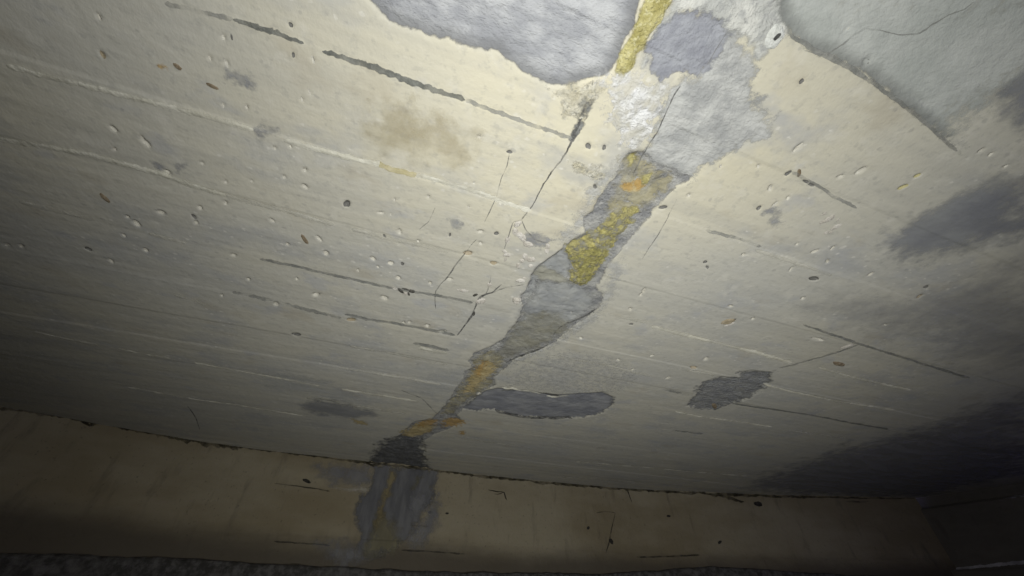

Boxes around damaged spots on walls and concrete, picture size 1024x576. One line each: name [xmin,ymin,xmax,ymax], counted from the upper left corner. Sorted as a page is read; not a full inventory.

peeling [371,0,639,85]
peeling [637,0,1024,184]
crack [504,97,594,249]
water stain [894,184,1024,258]
spalling [370,256,415,300]
crack [458,284,521,334]
spalling [688,371,772,410]
water stain [317,436,438,565]